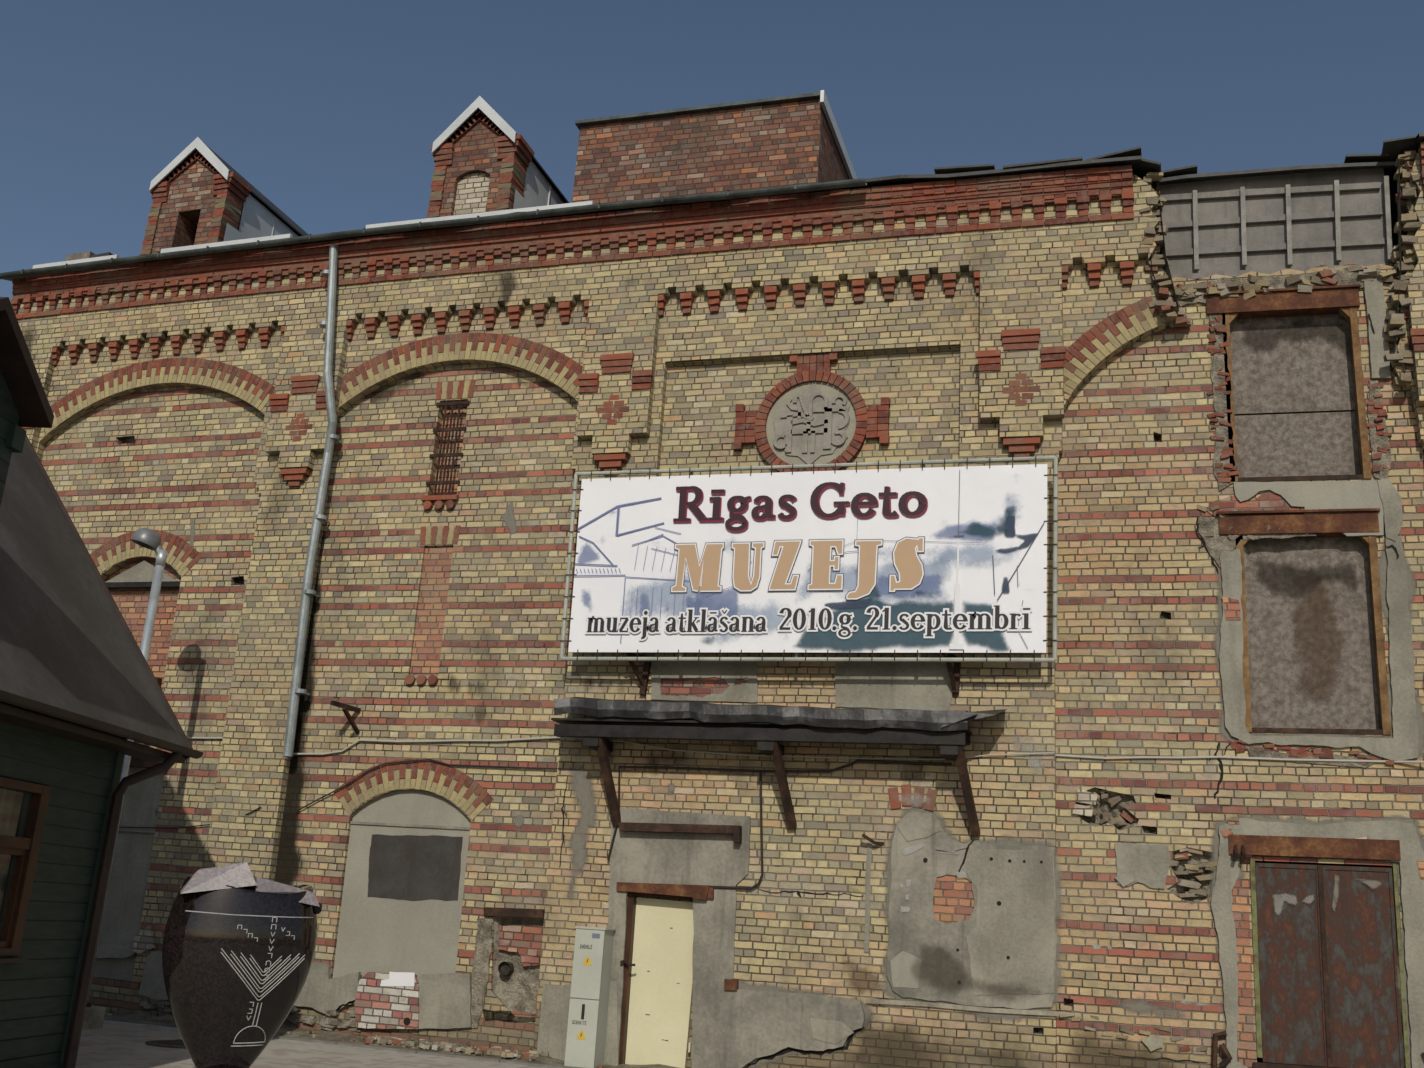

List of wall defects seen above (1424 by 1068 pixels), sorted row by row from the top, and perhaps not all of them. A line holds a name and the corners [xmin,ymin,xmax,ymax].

flaking render [1139,150,1424,768]
damp [274,534,324,886]
flaking render [96,925,172,1013]
flaking render [284,962,361,1032]
spalling [403,907,545,1029]
flaking render [696,981,872,1068]
flaking render [883,784,1424,1068]